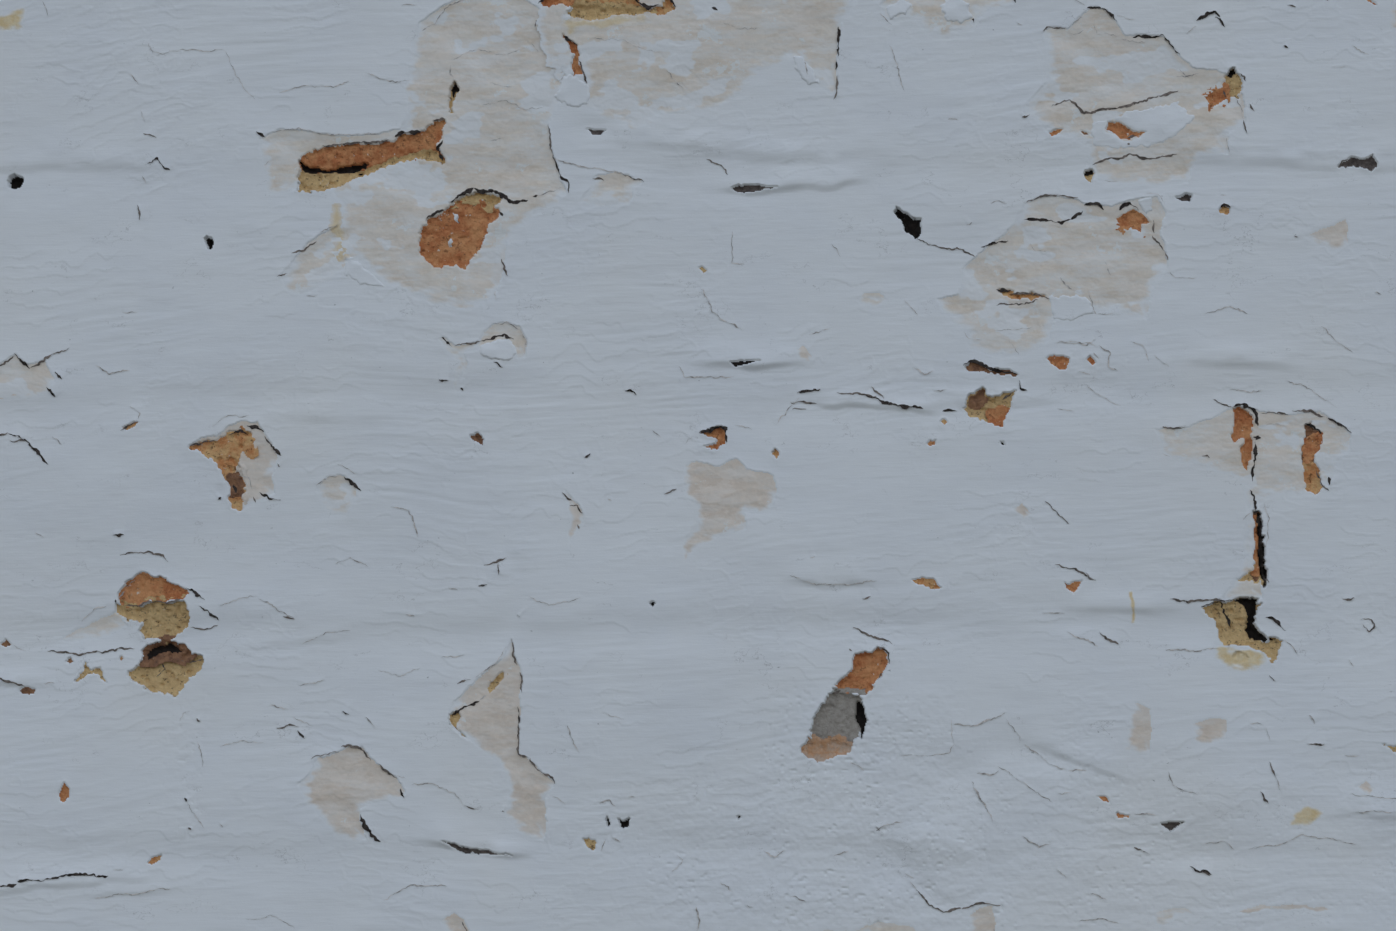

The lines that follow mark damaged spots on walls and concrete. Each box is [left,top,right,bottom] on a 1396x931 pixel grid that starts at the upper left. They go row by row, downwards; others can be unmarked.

peeling [256,0,853,309]
peeling [938,0,1254,427]
peeling [0,350,66,399]
flaking render [189,415,281,512]
peeling [665,425,779,561]
peeling [1156,382,1351,681]
crack [1243,490,1270,586]
peeling [67,659,106,682]
flaking render [115,572,218,697]
peeling [298,744,405,842]
peeling [449,642,555,840]
flaking render [801,627,892,763]